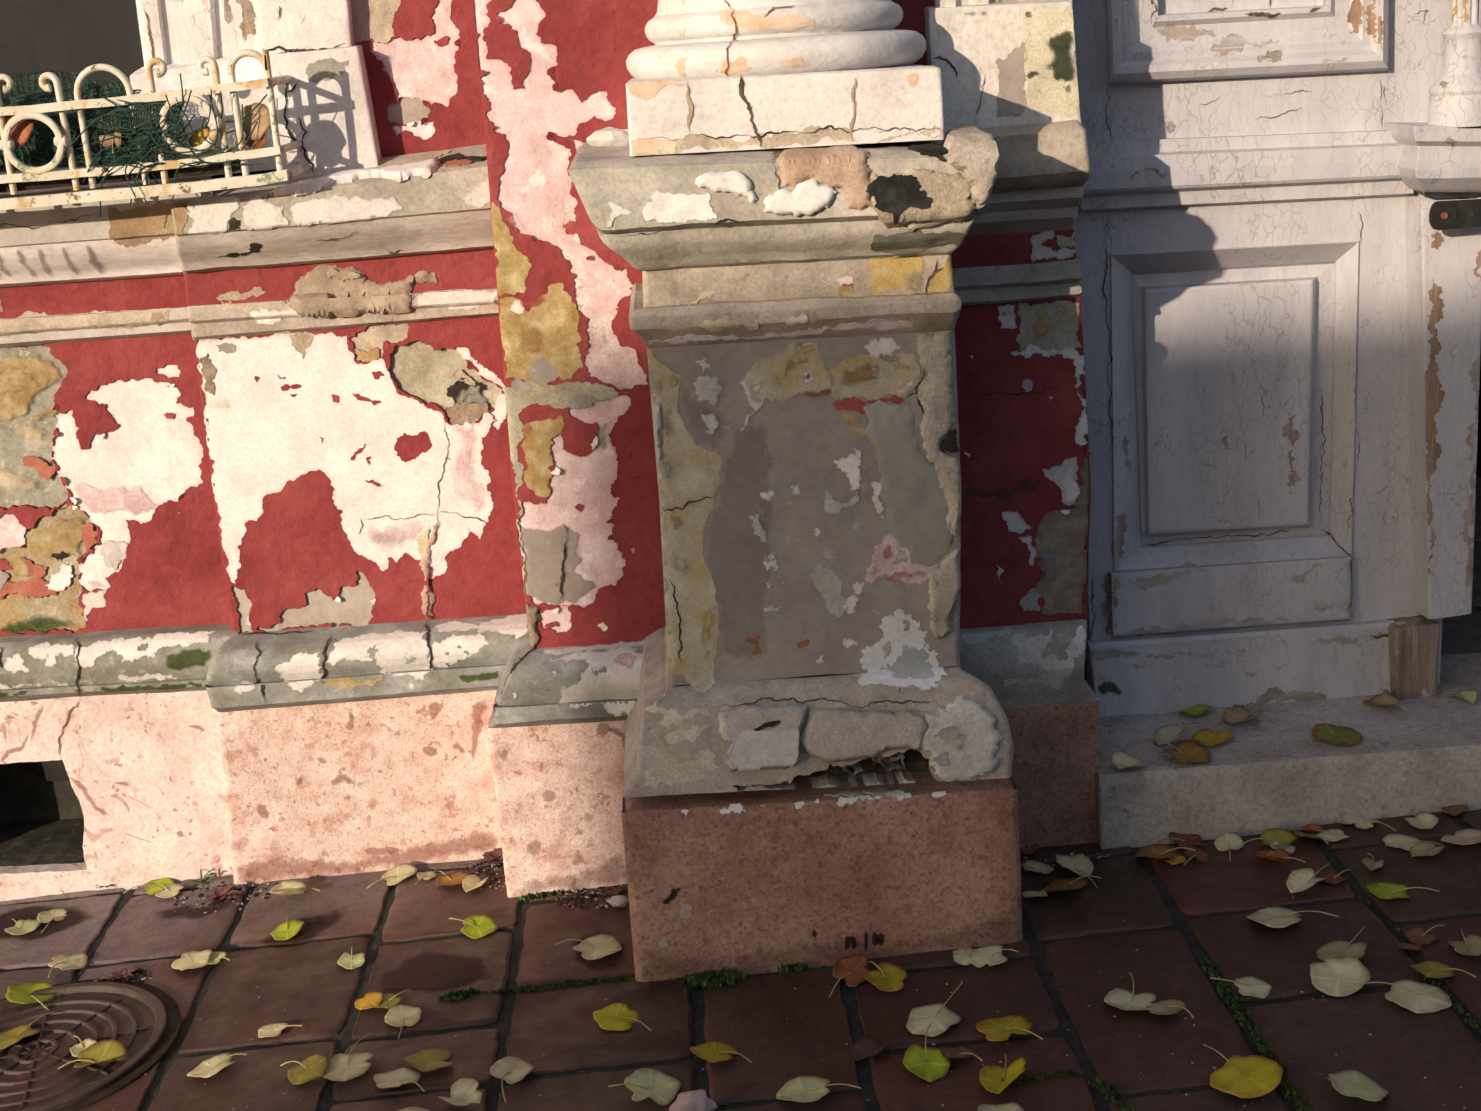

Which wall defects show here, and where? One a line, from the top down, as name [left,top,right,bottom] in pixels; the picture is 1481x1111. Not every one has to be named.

crack [647,1,939,190]
peeling [1473,250,1481,278]
peeling [0,0,1290,798]
peeling [1424,280,1445,576]
peeling [1461,356,1480,588]
crack [58,637,83,760]
crack [241,630,331,703]
crack [715,687,937,708]
peeling [718,803,765,814]
peeling [794,788,912,809]